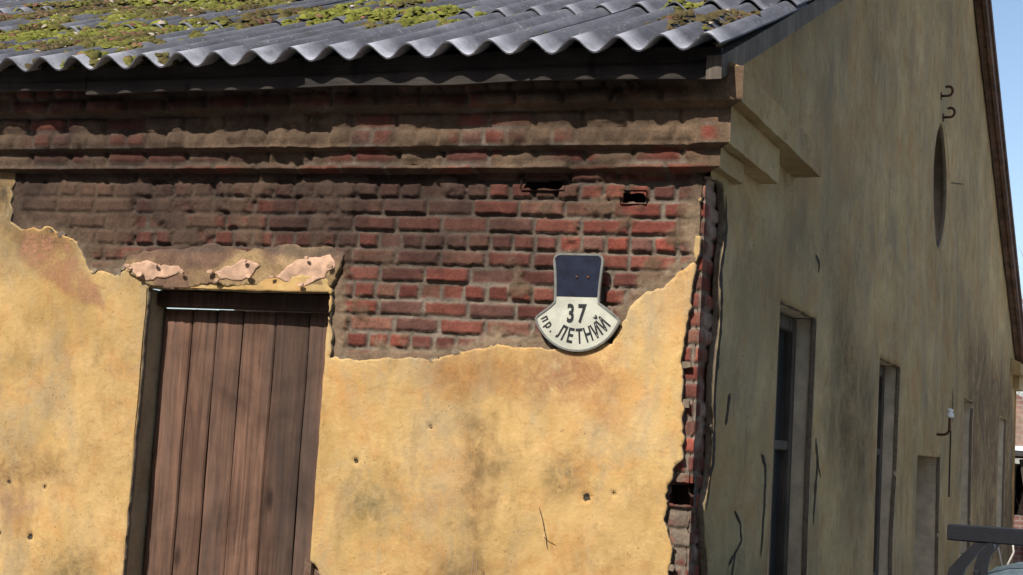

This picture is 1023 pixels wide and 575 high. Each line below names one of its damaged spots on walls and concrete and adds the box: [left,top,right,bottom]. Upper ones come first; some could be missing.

spalling [0,66,744,575]
crack [706,199,731,510]
crack [729,454,767,575]
crack [813,440,821,524]